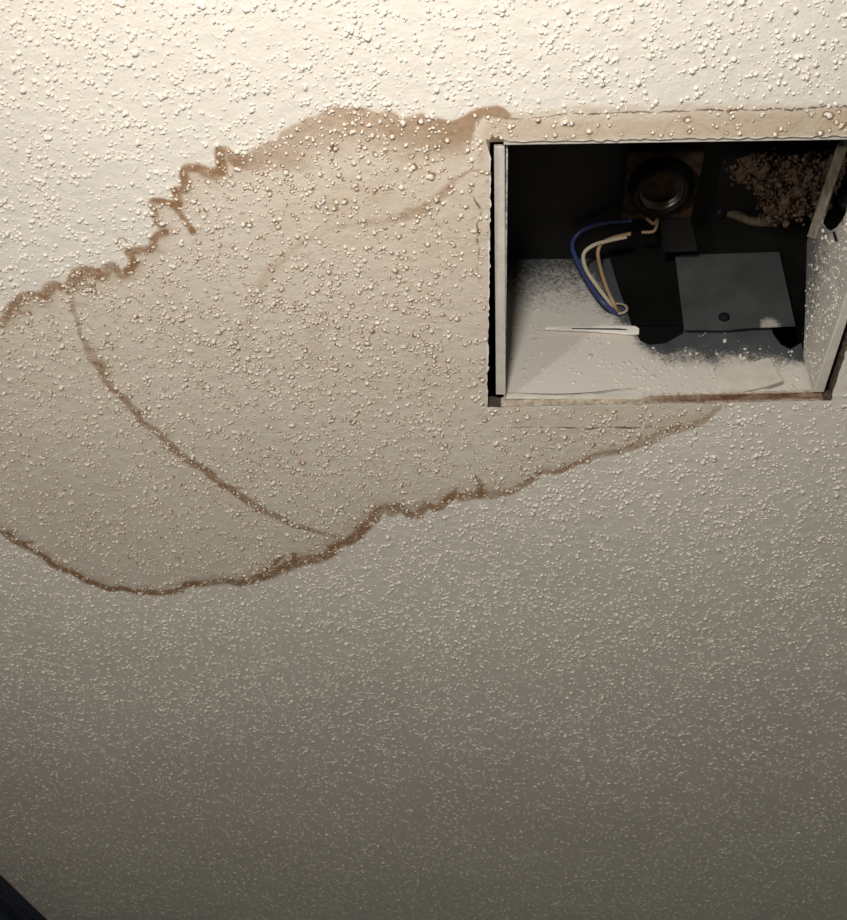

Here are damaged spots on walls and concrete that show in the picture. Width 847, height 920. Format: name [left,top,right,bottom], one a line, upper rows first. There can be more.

damp [711,110,766,136]
damp [803,109,847,137]
damp [0,106,726,596]